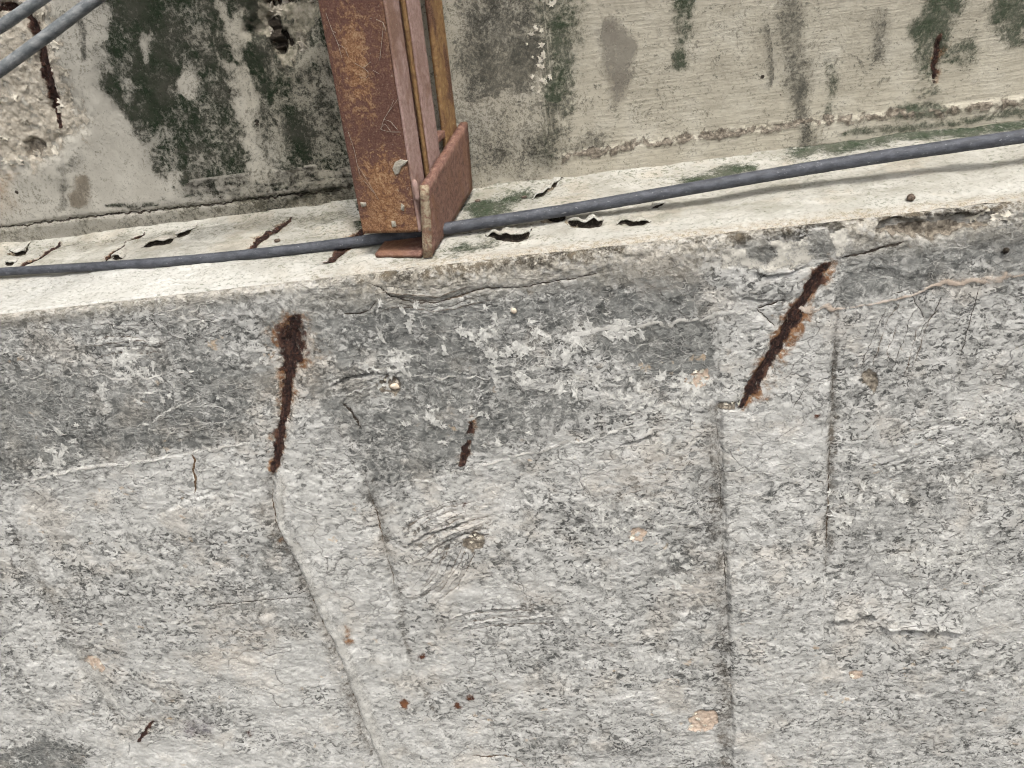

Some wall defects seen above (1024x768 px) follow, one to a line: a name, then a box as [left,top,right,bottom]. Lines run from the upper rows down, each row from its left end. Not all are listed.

damp [600,19,637,104]
corrosion [931,33,947,83]
peeling [5,241,61,266]
peeling [141,222,198,248]
peeling [485,200,665,242]
crack [344,270,611,314]
spalling [441,221,848,422]
peeling [400,408,454,446]
corrosion [458,416,477,467]